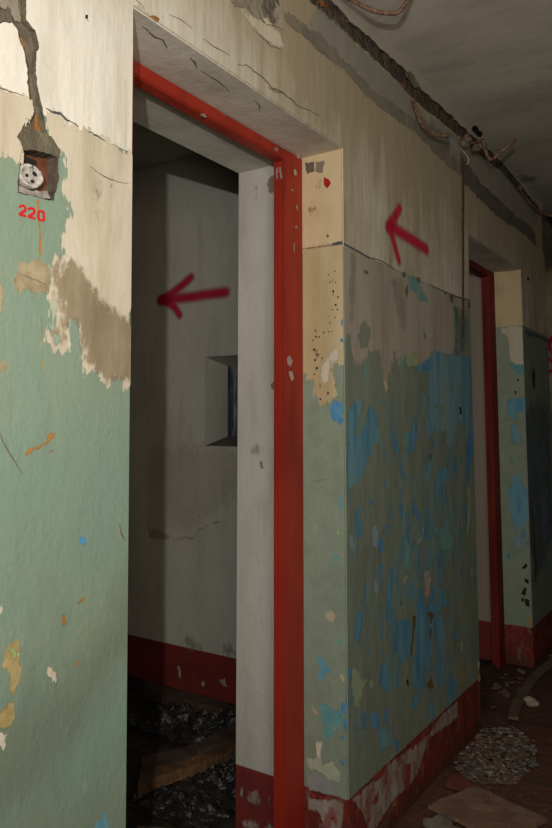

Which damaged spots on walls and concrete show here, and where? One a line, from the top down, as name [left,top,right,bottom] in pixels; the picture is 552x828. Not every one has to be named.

crack [169,14,319,116]
spalling [230,0,284,49]
peeling [0,84,34,166]
peeling [13,108,132,392]
peeling [287,242,474,538]
peeling [501,325,552,627]
spalling [0,639,22,751]
peeling [307,486,466,828]
spalling [240,787,261,806]